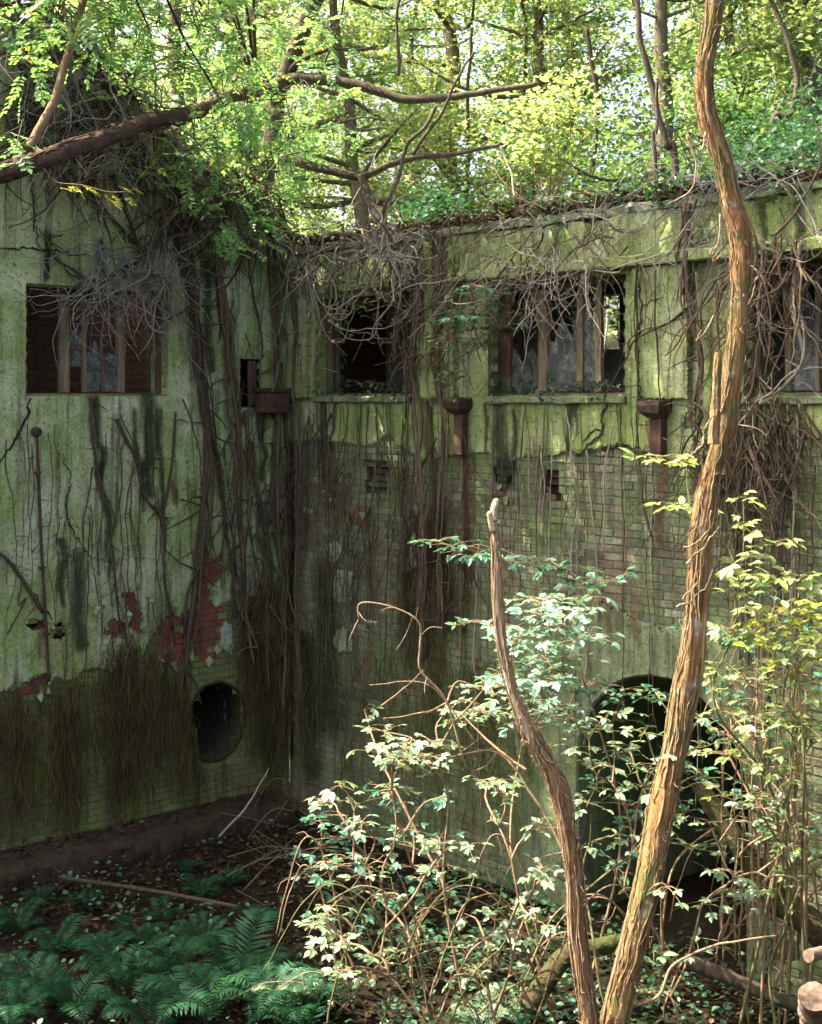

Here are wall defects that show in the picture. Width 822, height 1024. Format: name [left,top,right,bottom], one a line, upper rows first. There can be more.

crack [572,277,663,454]
crack [0,398,32,462]
water stain [89,395,112,577]
water stain [133,392,166,530]
water stain [483,395,516,483]
hole [545,470,563,501]
water stain [566,403,579,455]
water stain [56,538,86,649]
spalling [92,556,259,672]
spalling [17,671,53,702]